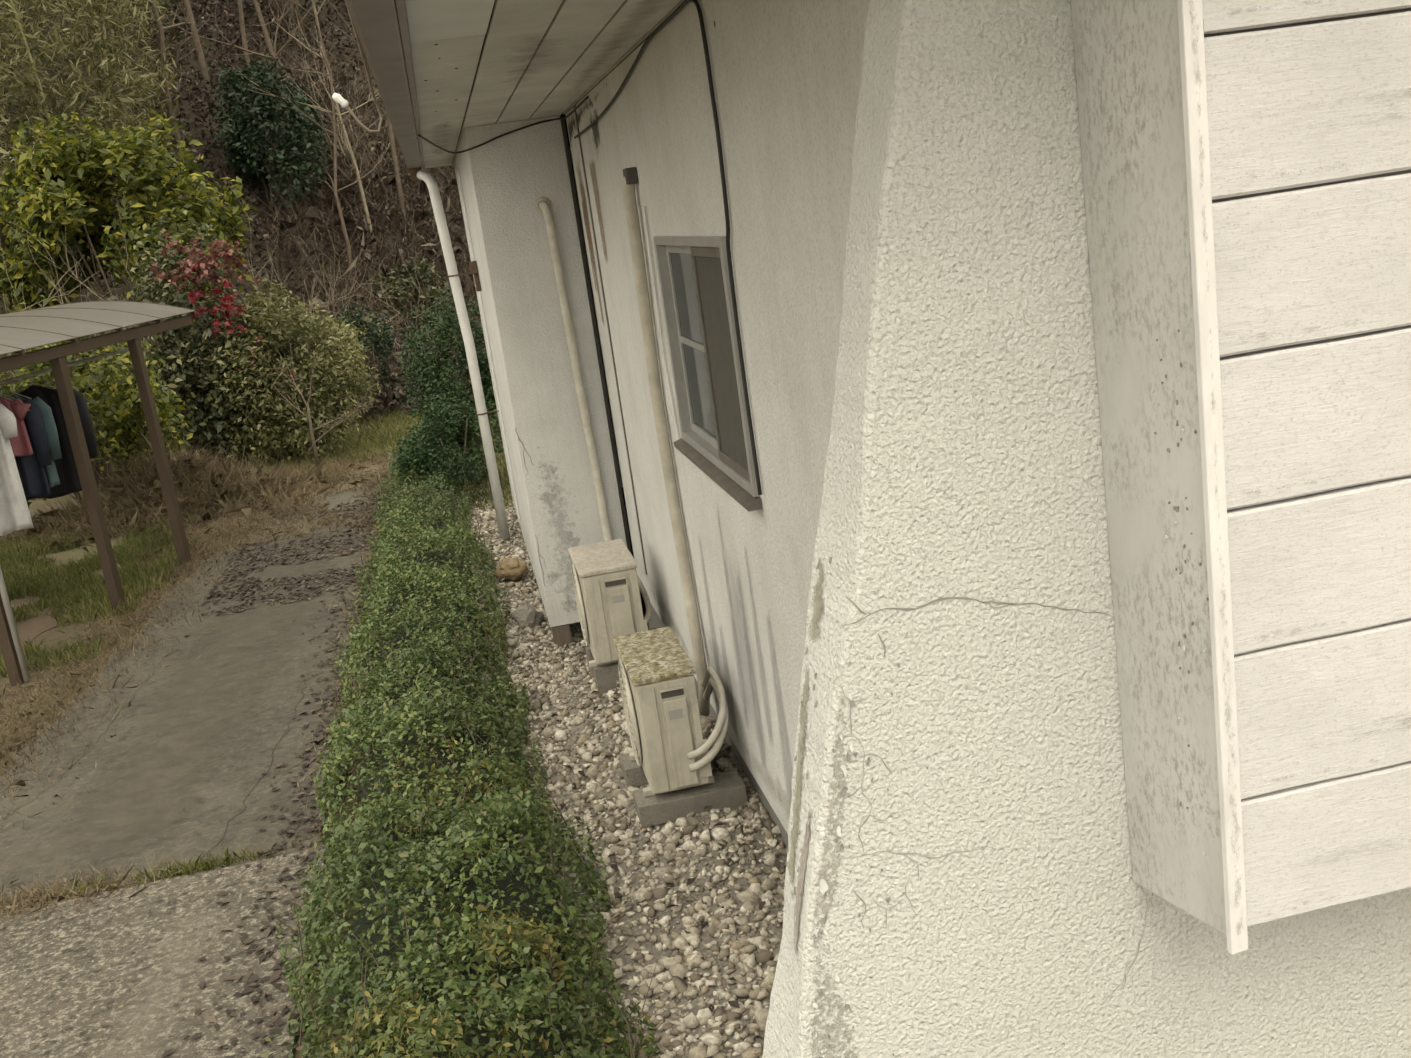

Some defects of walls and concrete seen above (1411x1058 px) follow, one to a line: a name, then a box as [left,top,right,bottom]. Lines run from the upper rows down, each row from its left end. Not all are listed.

crack [843,597,1114,657]
peeling [793,691,857,1058]
crack [833,661,995,929]